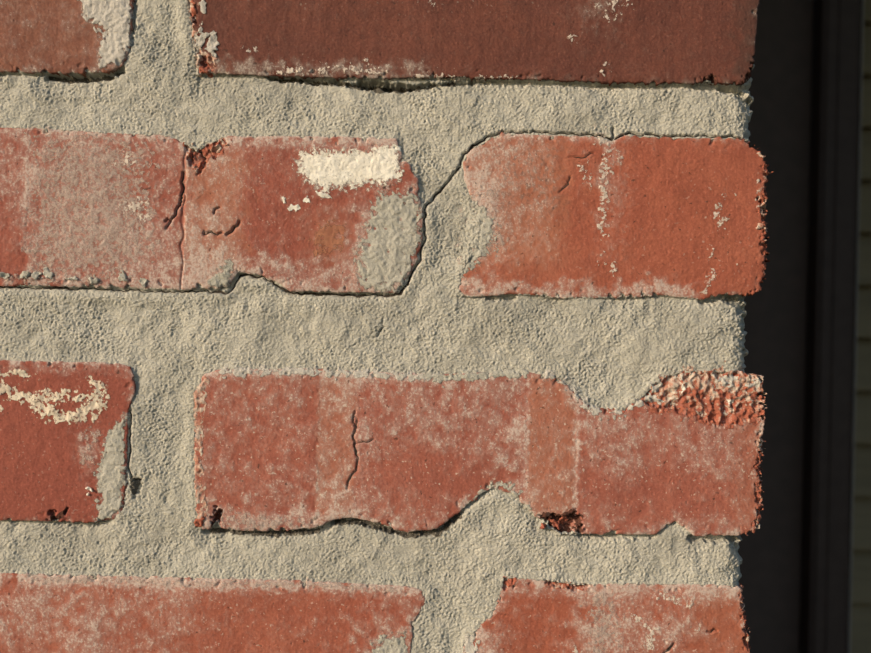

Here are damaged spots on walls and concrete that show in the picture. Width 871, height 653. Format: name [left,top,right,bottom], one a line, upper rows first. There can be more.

spalling [183,138,232,175]
crack [0,130,747,298]
leakage [0,369,110,425]
spalling [608,361,767,430]
crack [347,413,374,488]
spalling [751,435,766,533]
spalling [539,508,583,535]